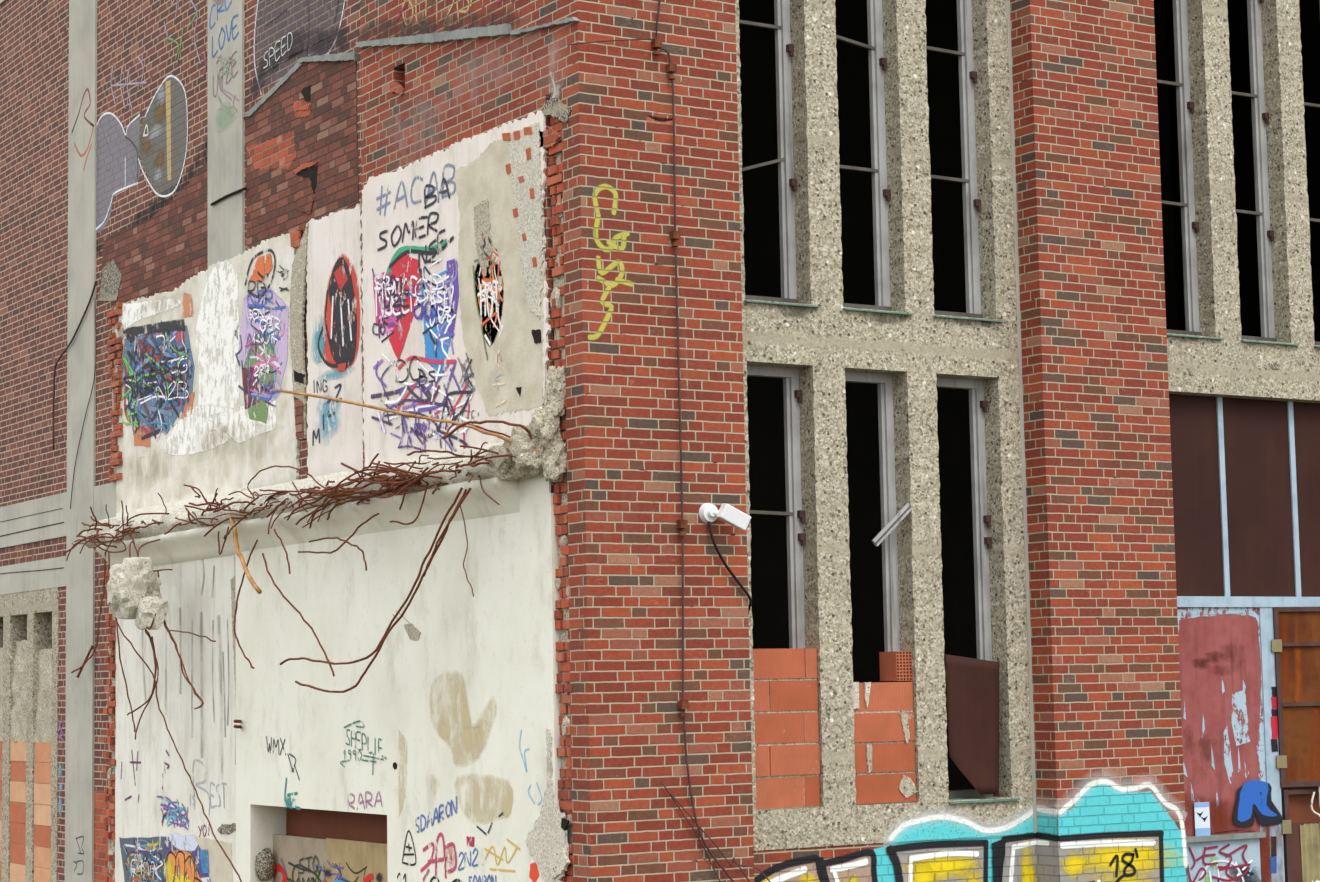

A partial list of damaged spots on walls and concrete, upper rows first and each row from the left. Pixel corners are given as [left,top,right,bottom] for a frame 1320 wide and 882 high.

flaking render [245,60,359,250]
flaking render [71,90,574,882]
water stain [431,678,487,763]
water stain [466,777,512,821]
peeling [1177,607,1266,800]